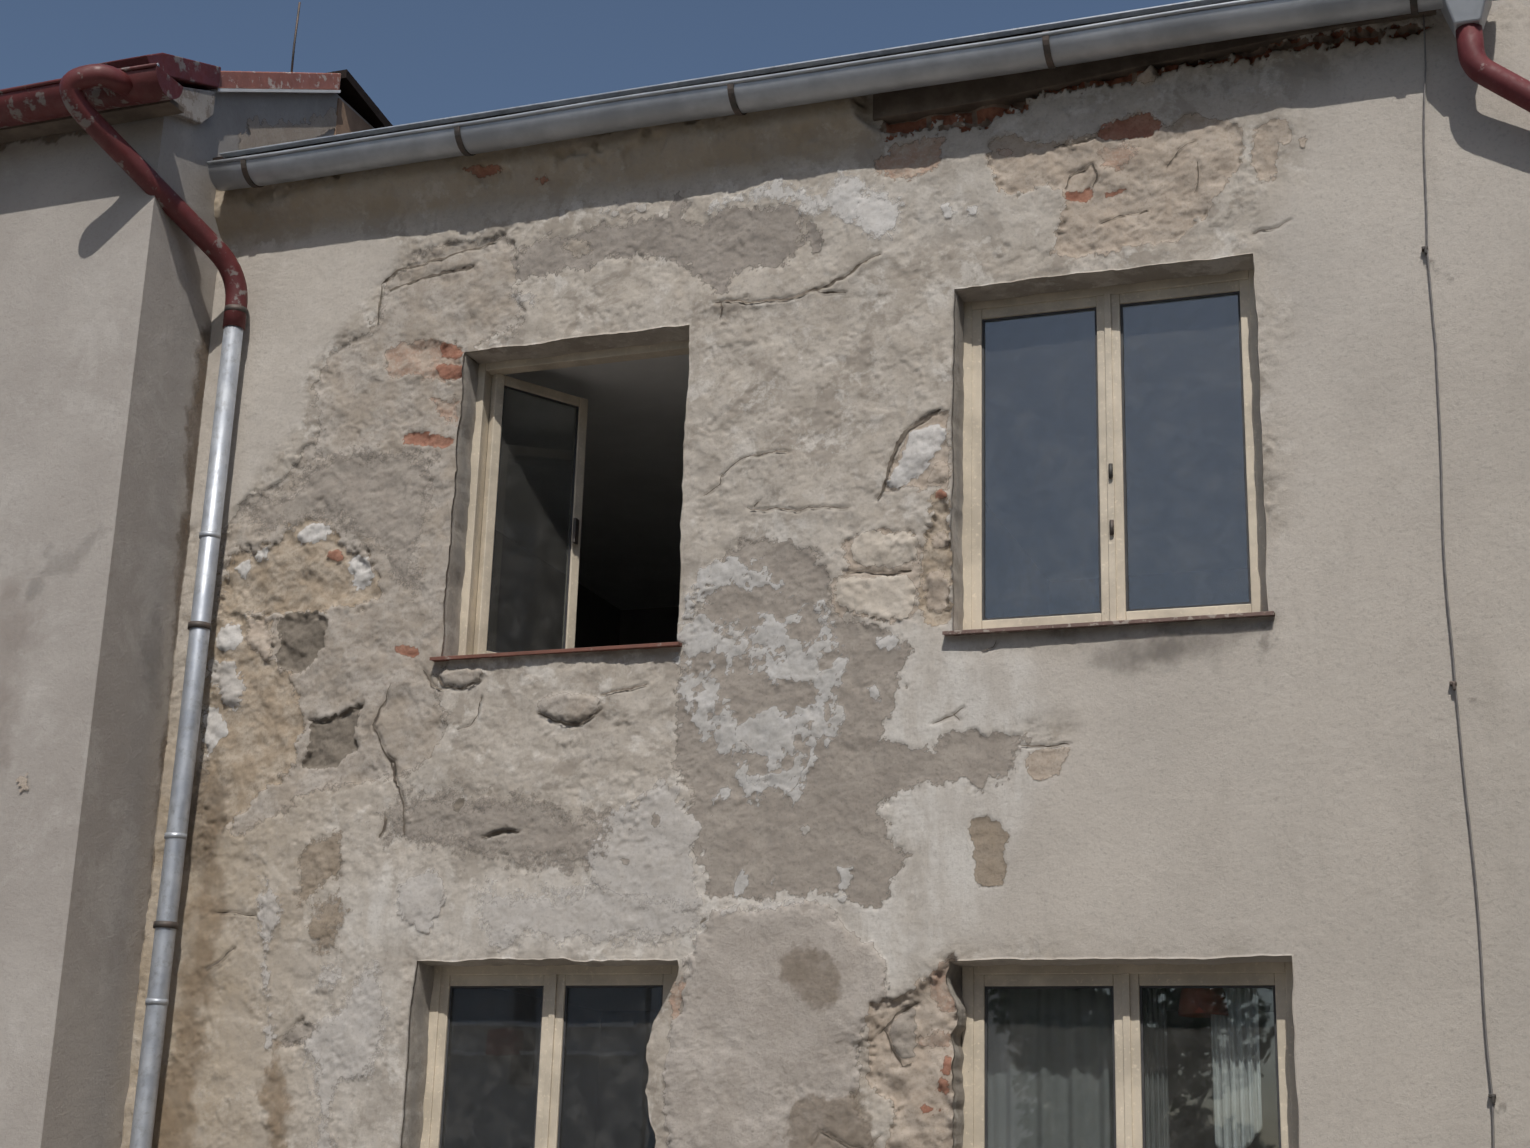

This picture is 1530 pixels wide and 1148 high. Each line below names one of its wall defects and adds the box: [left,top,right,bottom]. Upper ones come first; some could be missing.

crack [377,234,506,324]
crack [715,254,881,319]
crack [704,450,849,512]
flaking render [195,23,1433,952]
crack [372,683,405,838]
flaking render [864,953,958,1148]